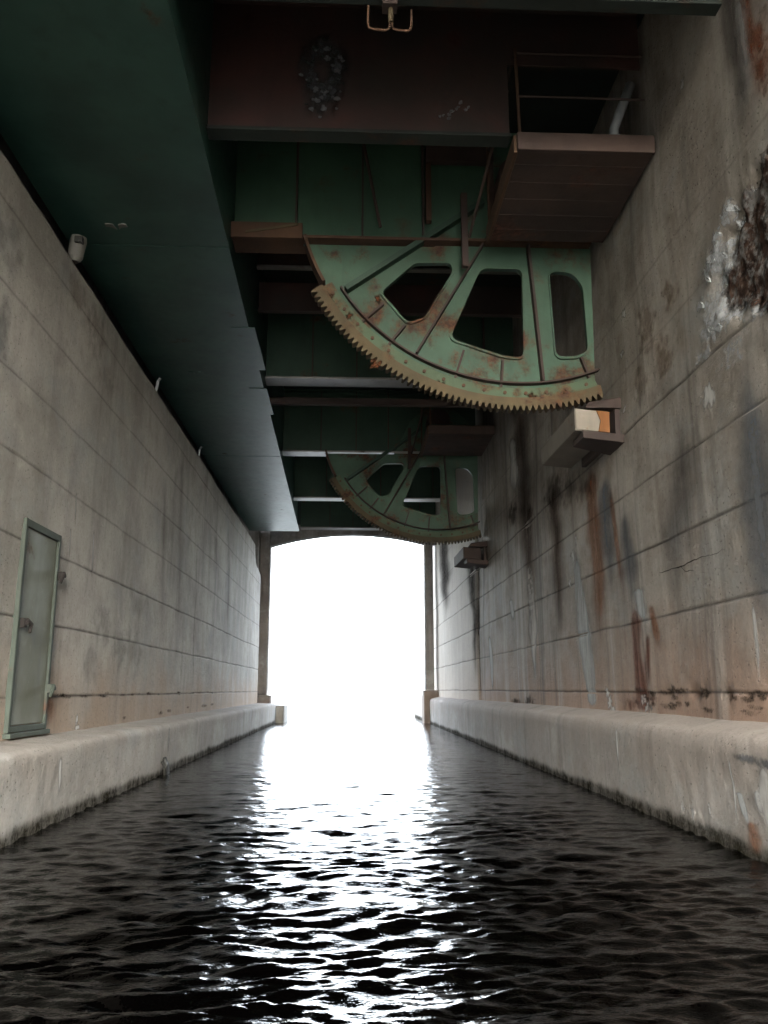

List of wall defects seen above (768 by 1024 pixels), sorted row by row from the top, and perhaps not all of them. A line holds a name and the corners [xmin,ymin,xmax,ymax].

spalling [697,146,768,361]
damp [440,543,449,599]
damp [469,566,479,656]
damp [509,415,537,669]
rust [588,475,603,616]
rust [629,607,658,709]
crack [661,551,720,573]
damp [729,755,768,824]